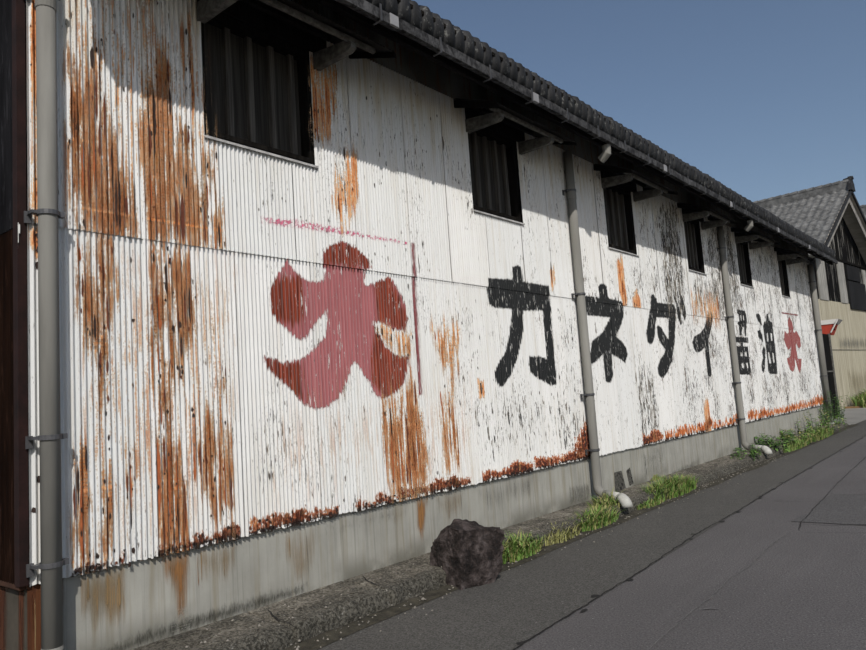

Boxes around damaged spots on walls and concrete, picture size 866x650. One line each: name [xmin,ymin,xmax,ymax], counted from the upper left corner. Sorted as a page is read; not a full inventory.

corrosion [332,145,359,233]
corrosion [62,0,339,617]
corrosion [617,257,641,308]
corrosion [691,293,720,323]
corrosion [355,319,471,534]
corrosion [477,378,485,399]
corrosion [482,413,590,483]
corrosion [642,395,825,446]
corrosion [0,583,41,650]